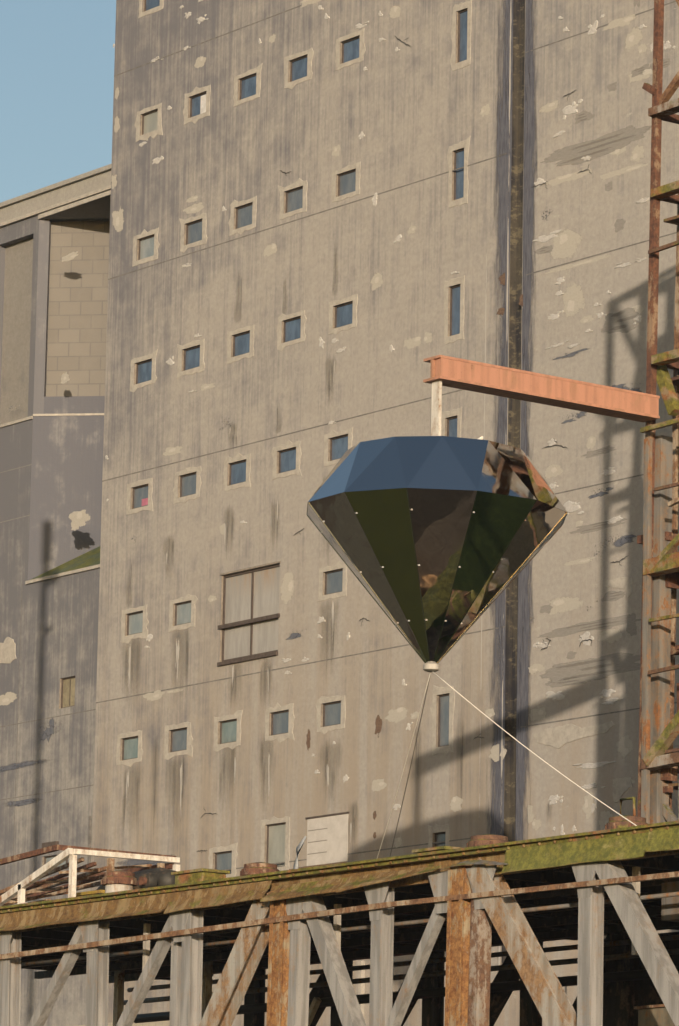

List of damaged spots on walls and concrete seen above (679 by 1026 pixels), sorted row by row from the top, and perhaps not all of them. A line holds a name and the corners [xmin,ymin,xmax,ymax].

spalling [588,14,604,35]
spalling [624,16,675,53]
spalling [548,99,583,138]
spalling [563,501,584,524]